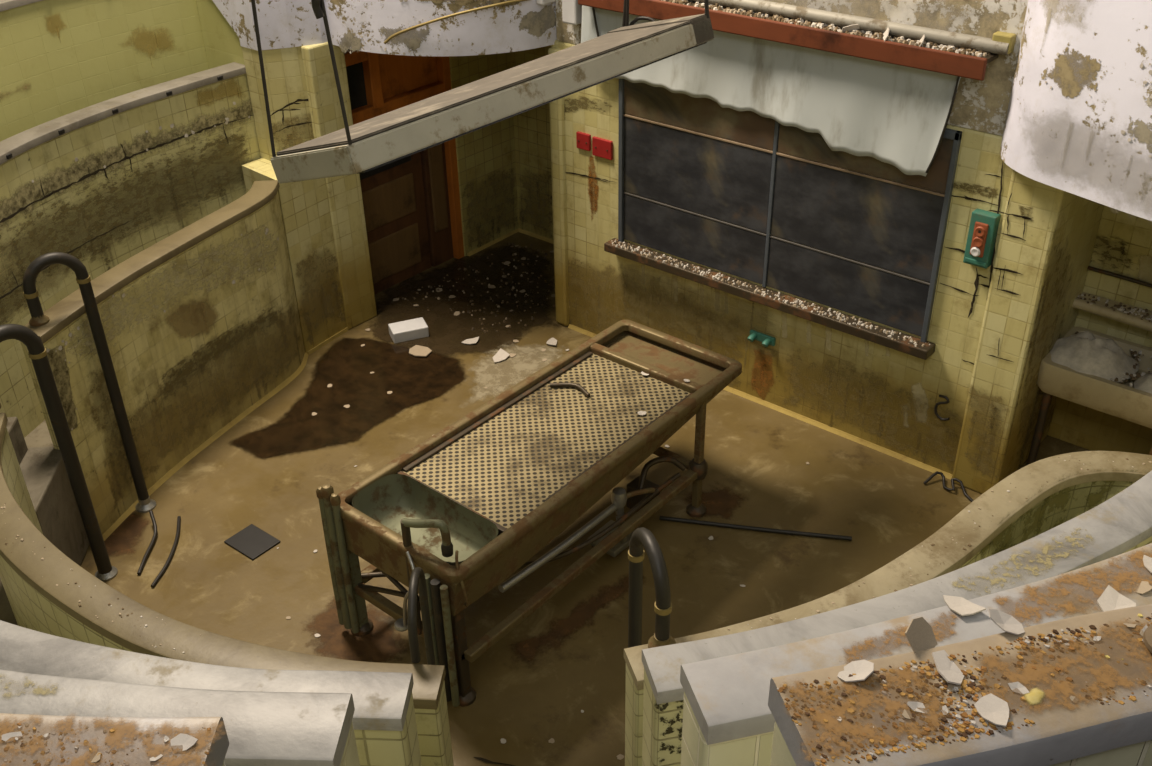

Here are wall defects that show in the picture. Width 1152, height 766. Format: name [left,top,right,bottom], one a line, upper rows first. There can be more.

peeling [336,32,366,54]
peeling [378,16,441,55]
peeling [399,0,556,39]
peeling [1041,44,1107,98]
peeling [1121,63,1152,158]
crack [0,99,312,223]
corrosion [588,157,599,219]
crack [0,218,135,299]
water stain [0,134,247,325]
crack [940,162,1032,317]
crack [961,338,1012,365]